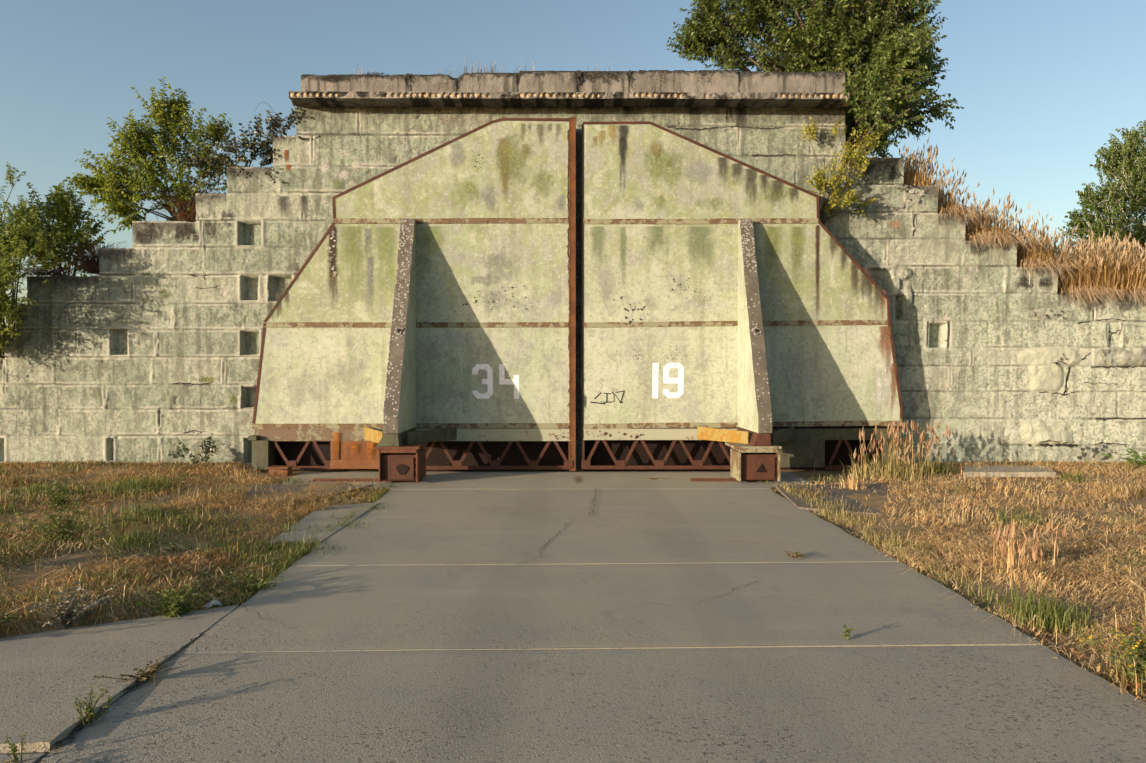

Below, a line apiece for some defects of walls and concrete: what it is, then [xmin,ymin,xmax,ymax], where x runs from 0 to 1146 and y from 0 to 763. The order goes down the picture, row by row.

leakage [619,107,645,176]
leakage [719,157,798,198]
leakage [327,226,337,293]
leakage [365,229,373,294]
rust [880,327,896,398]
crack [37,628,209,763]